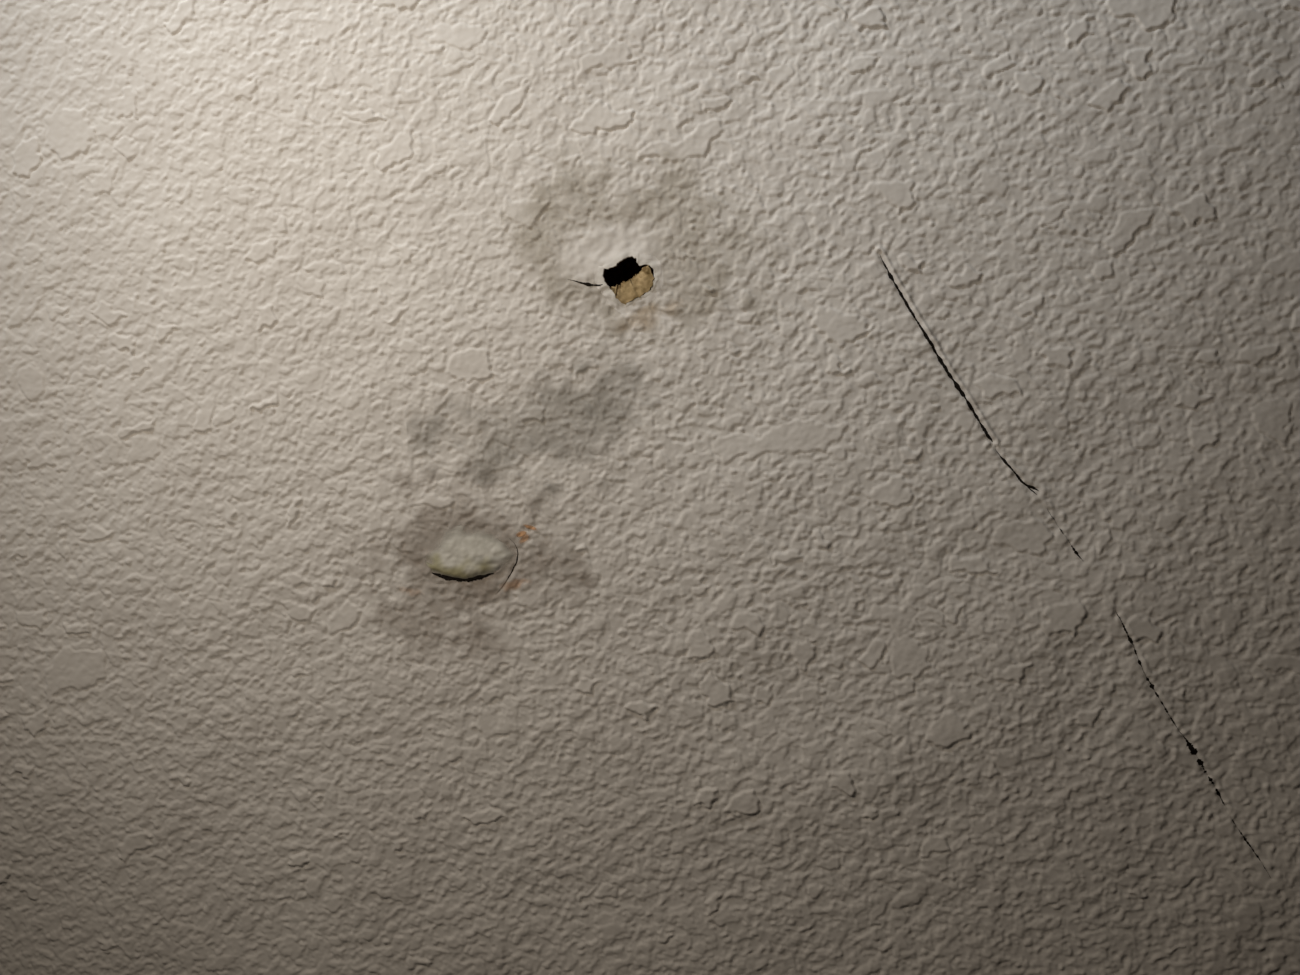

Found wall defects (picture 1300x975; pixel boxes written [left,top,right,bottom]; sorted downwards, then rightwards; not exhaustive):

spalling [609,265,654,304]
crack [879,254,1081,559]
crack [1116,613,1270,876]